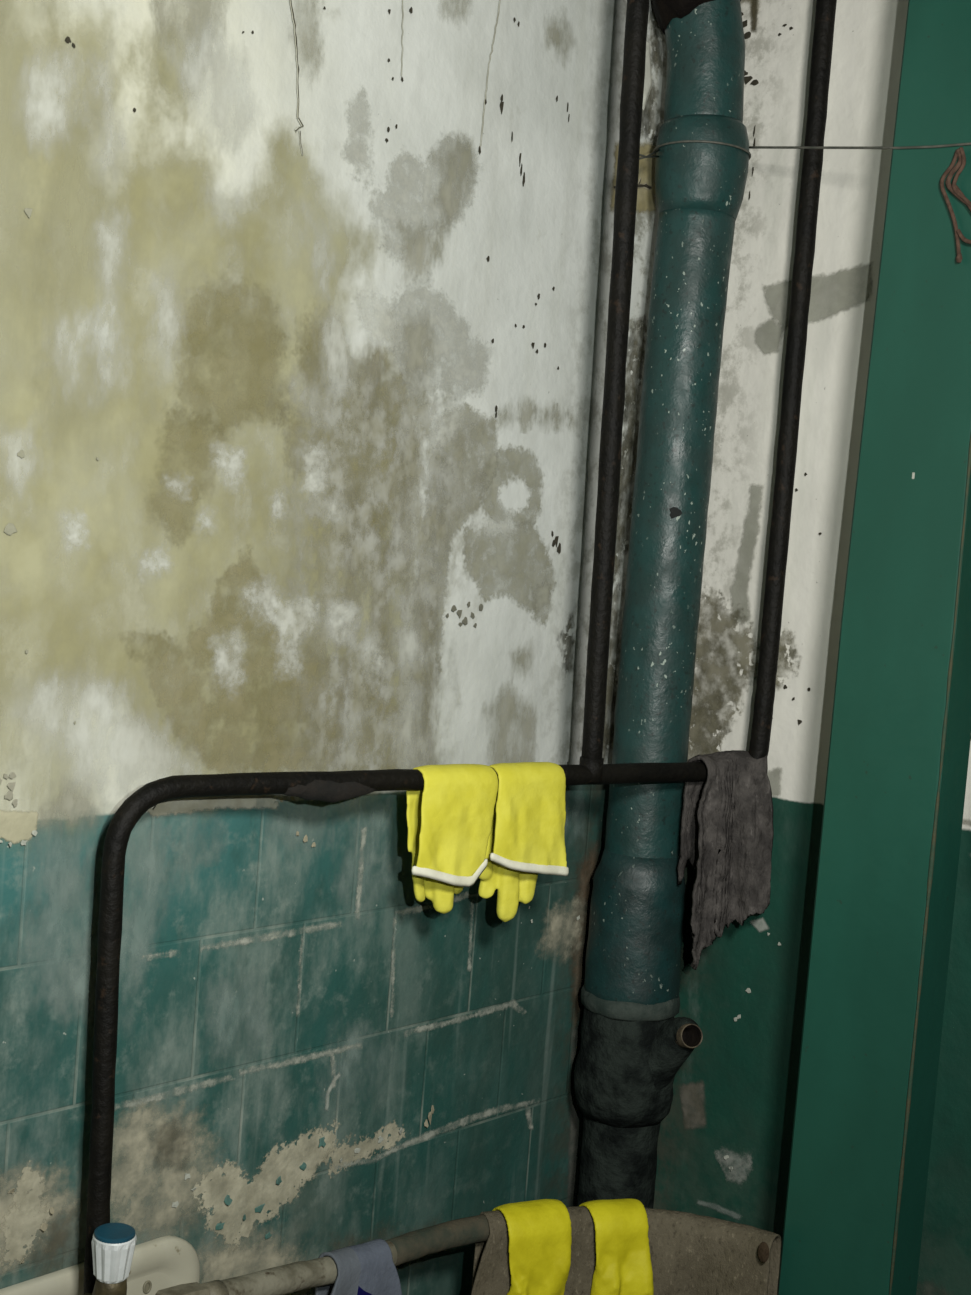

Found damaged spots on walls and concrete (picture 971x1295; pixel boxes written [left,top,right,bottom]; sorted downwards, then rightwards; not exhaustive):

crack [290,0,304,155]
crack [480,0,501,148]
water stain [756,281,792,354]
water stain [808,265,871,322]
water stain [0,0,558,824]
water stain [603,317,646,759]
water stain [561,615,575,670]
water stain [687,485,762,762]
water stain [776,631,799,687]
peeling [416,1002,526,1032]
peeling [110,1032,533,1251]
peeling [0,1161,77,1273]